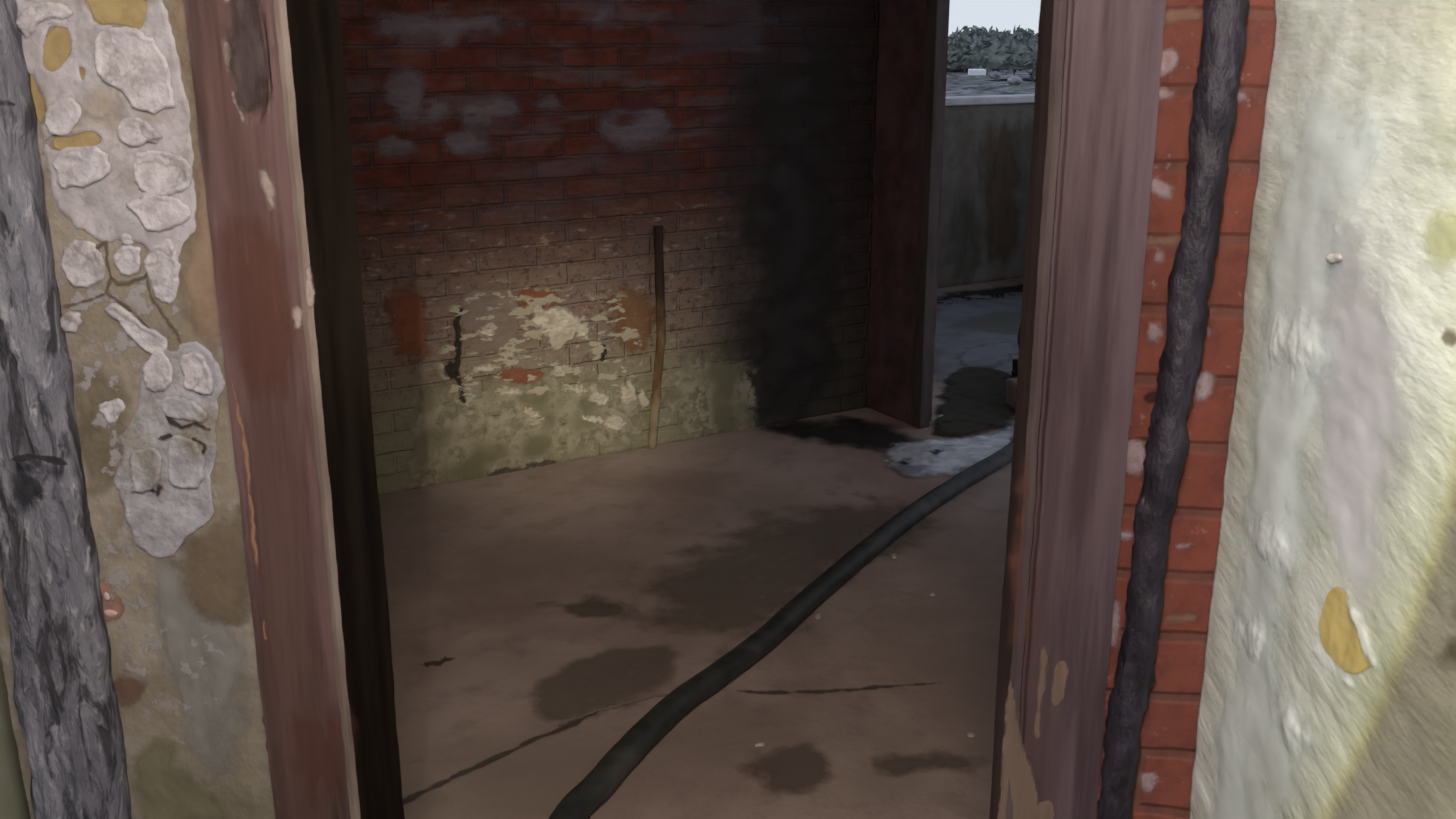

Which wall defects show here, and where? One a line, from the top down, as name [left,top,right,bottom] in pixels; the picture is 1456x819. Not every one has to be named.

peeling [261,171,275,207]
crack [64,240,181,343]
peeling [15,0,258,711]
peeling [386,281,650,444]
peeling [1214,107,1409,819]
leakage [537,647,673,719]
crack [739,683,932,694]
leakage [748,746,827,792]
leakage [878,754,969,775]